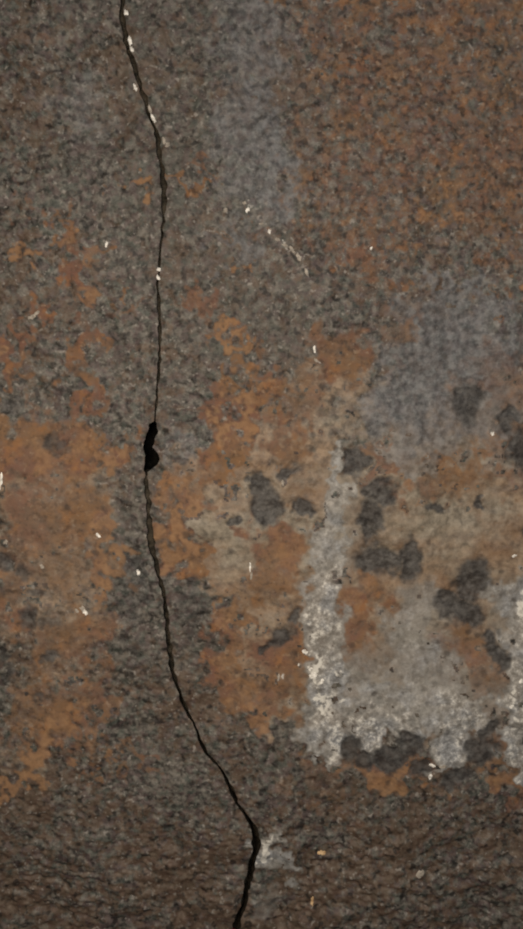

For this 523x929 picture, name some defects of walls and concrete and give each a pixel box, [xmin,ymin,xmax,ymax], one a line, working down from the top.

water stain [27,53,129,179]
water stain [172,0,318,282]
rust [149,0,523,579]
rust [0,215,168,813]
crack [119,0,261,929]
rust [195,521,462,849]
water stain [157,255,523,787]
rust [429,622,510,700]
rust [477,732,523,834]